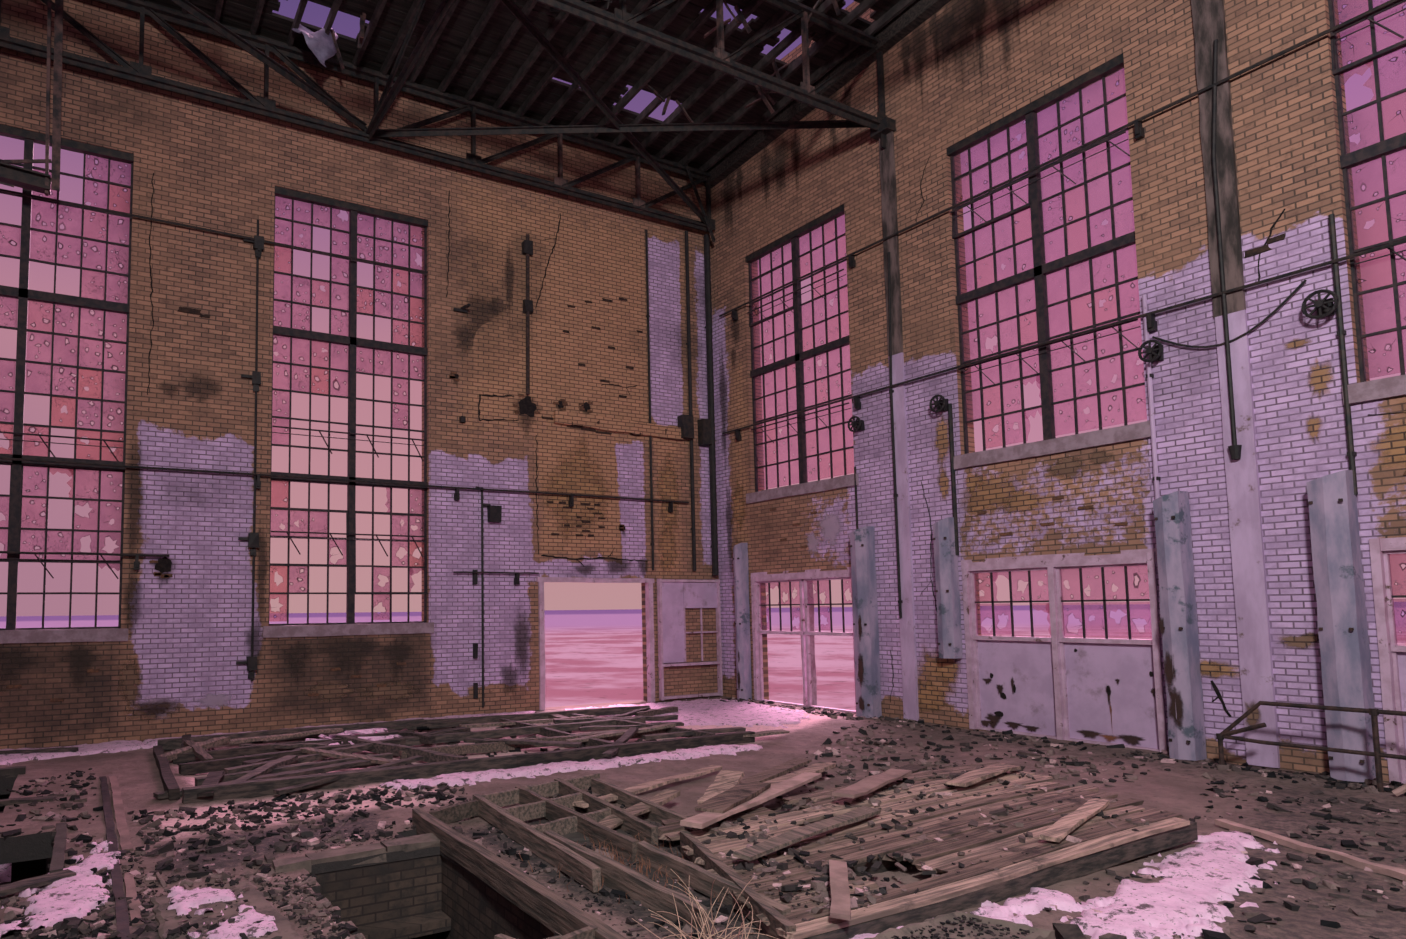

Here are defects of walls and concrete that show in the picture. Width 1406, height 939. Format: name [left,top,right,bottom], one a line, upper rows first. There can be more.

damp [901,0,1019,86]
peeling [936,419,949,499]
peeling [1047,450,1112,478]
peeling [964,473,1094,526]
spalling [149,557,173,581]
peeling [120,660,178,720]
peeling [918,652,958,711]